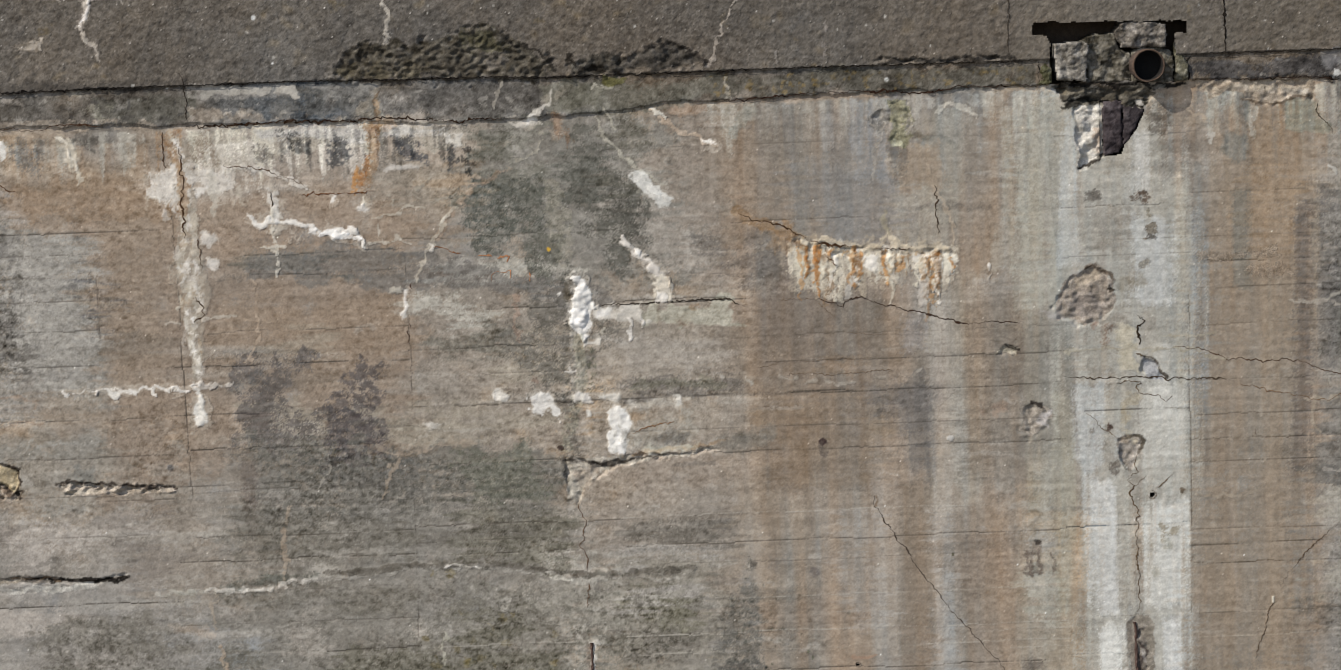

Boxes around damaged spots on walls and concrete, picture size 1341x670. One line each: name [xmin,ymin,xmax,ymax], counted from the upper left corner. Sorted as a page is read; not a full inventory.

leakage [649,106,668,121]
leakage [700,98,758,159]
spalling [1051,74,1334,170]
crack [0,0,1041,364]
leakage [0,114,758,535]
spalling [1054,262,1170,381]
spalling [0,462,25,505]
spalling [54,479,178,497]
leakage [711,422,778,457]
crack [873,495,1001,665]